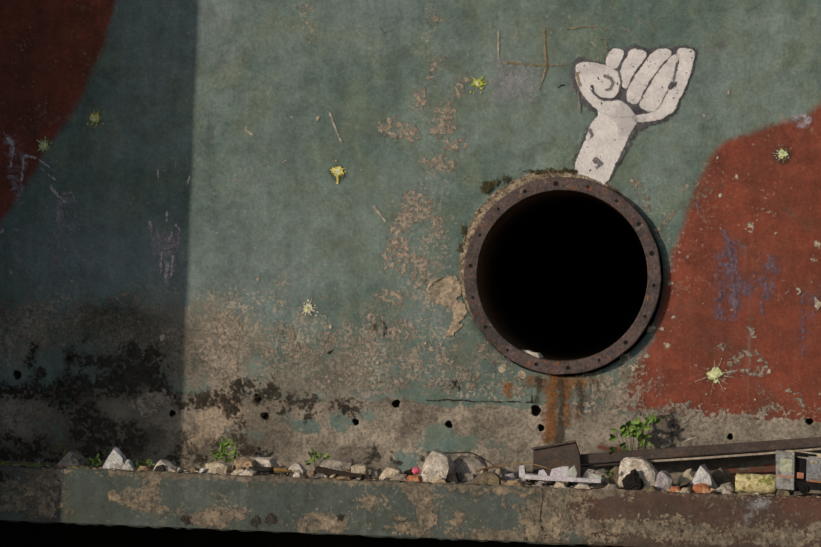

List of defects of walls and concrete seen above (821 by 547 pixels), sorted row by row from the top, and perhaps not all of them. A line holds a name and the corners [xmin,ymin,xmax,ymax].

peeling [368,54,475,176]
peeling [260,189,533,397]
water stain [0,342,363,469]
corrosion [525,374,599,444]
peeling [568,343,780,430]
water stain [355,444,403,465]
peeling [0,472,64,520]
peeling [108,473,171,516]
peeling [190,504,251,529]
peeling [296,510,359,534]
peeling [381,483,439,536]
peeling [438,484,821,547]